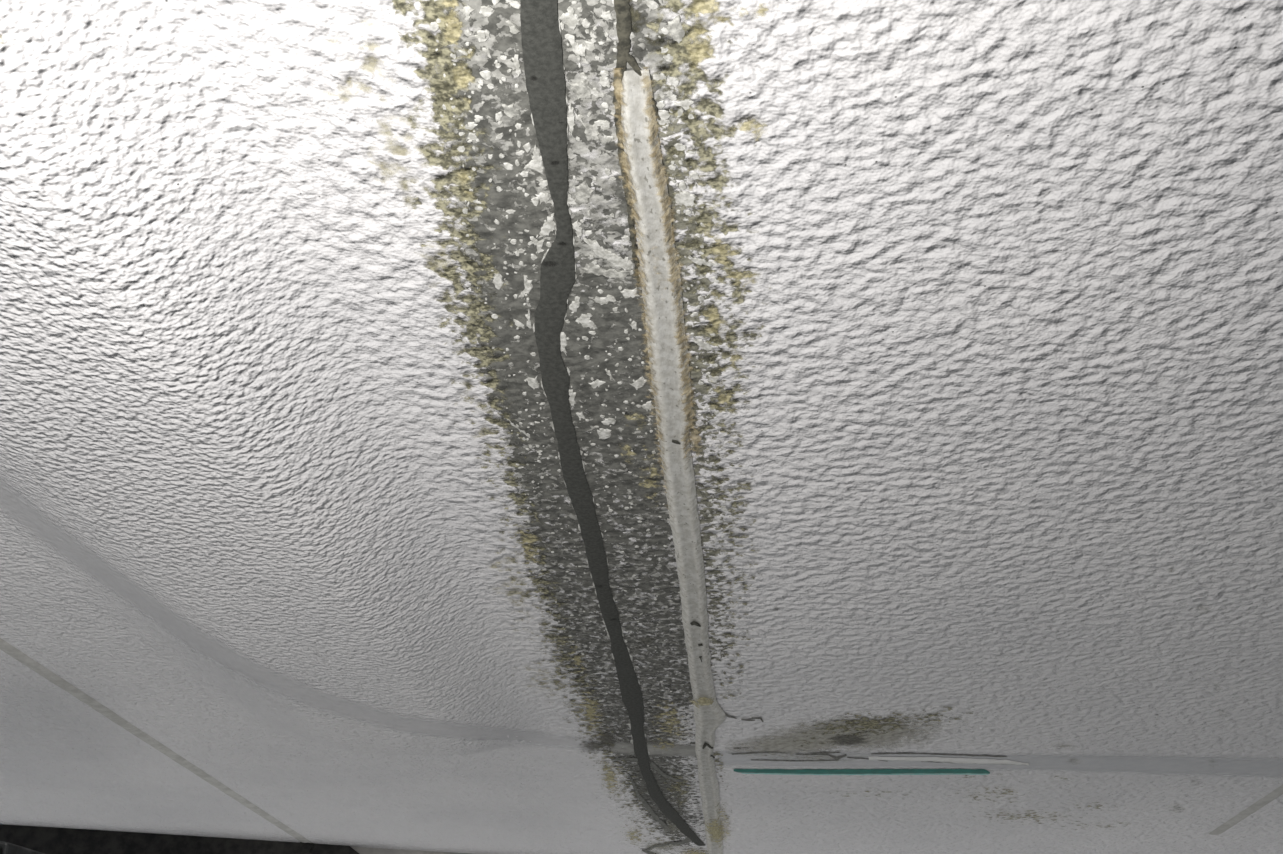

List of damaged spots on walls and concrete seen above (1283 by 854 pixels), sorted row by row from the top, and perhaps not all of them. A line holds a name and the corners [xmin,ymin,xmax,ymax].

damp [380,0,731,854]
crack [520,0,705,854]
damp [647,0,764,707]
crack [725,714,763,722]
damp [737,707,974,759]